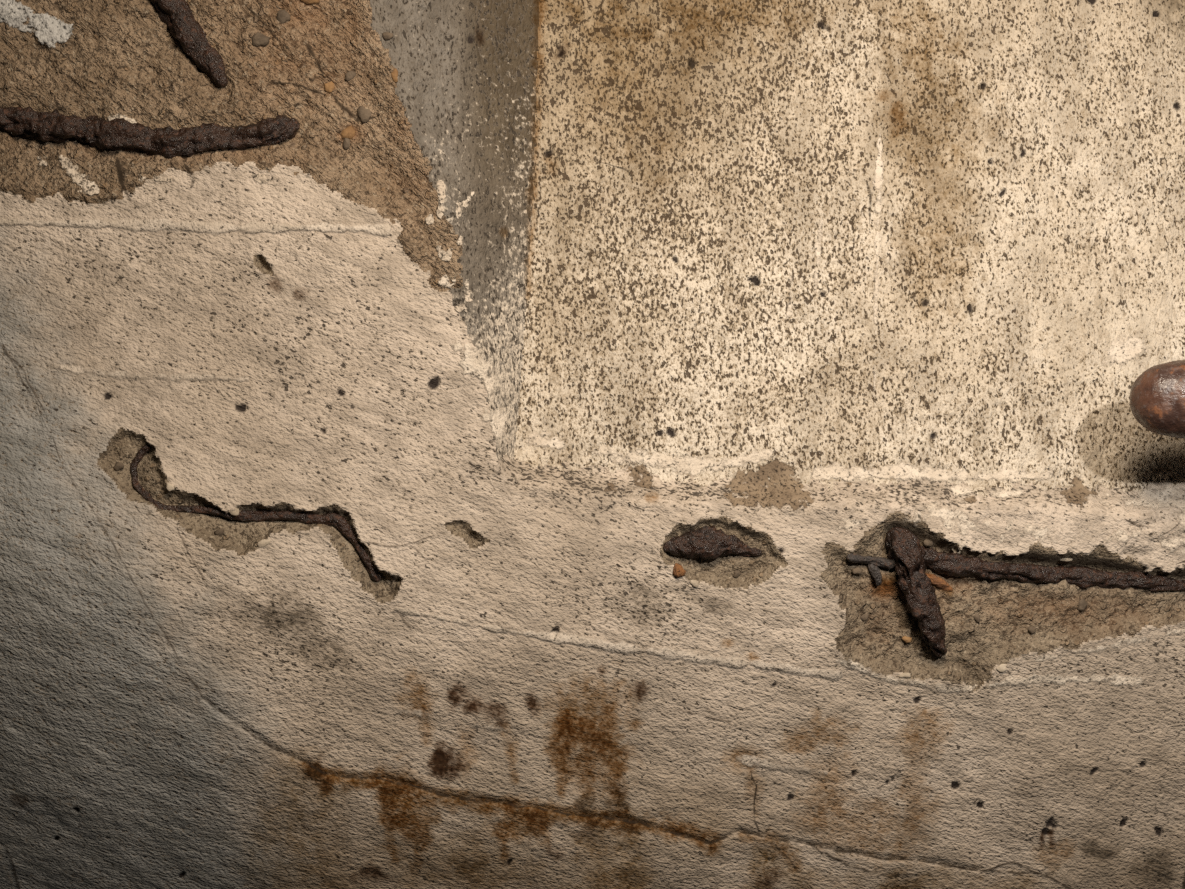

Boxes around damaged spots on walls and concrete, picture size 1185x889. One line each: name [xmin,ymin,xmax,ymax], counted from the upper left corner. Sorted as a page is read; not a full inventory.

spalling [0,0,475,313]
spalling [97,427,403,604]
spalling [592,445,1185,693]
rust [925,573,953,592]
rust [429,749,461,775]
rust [449,688,500,715]
crack [190,678,1073,889]